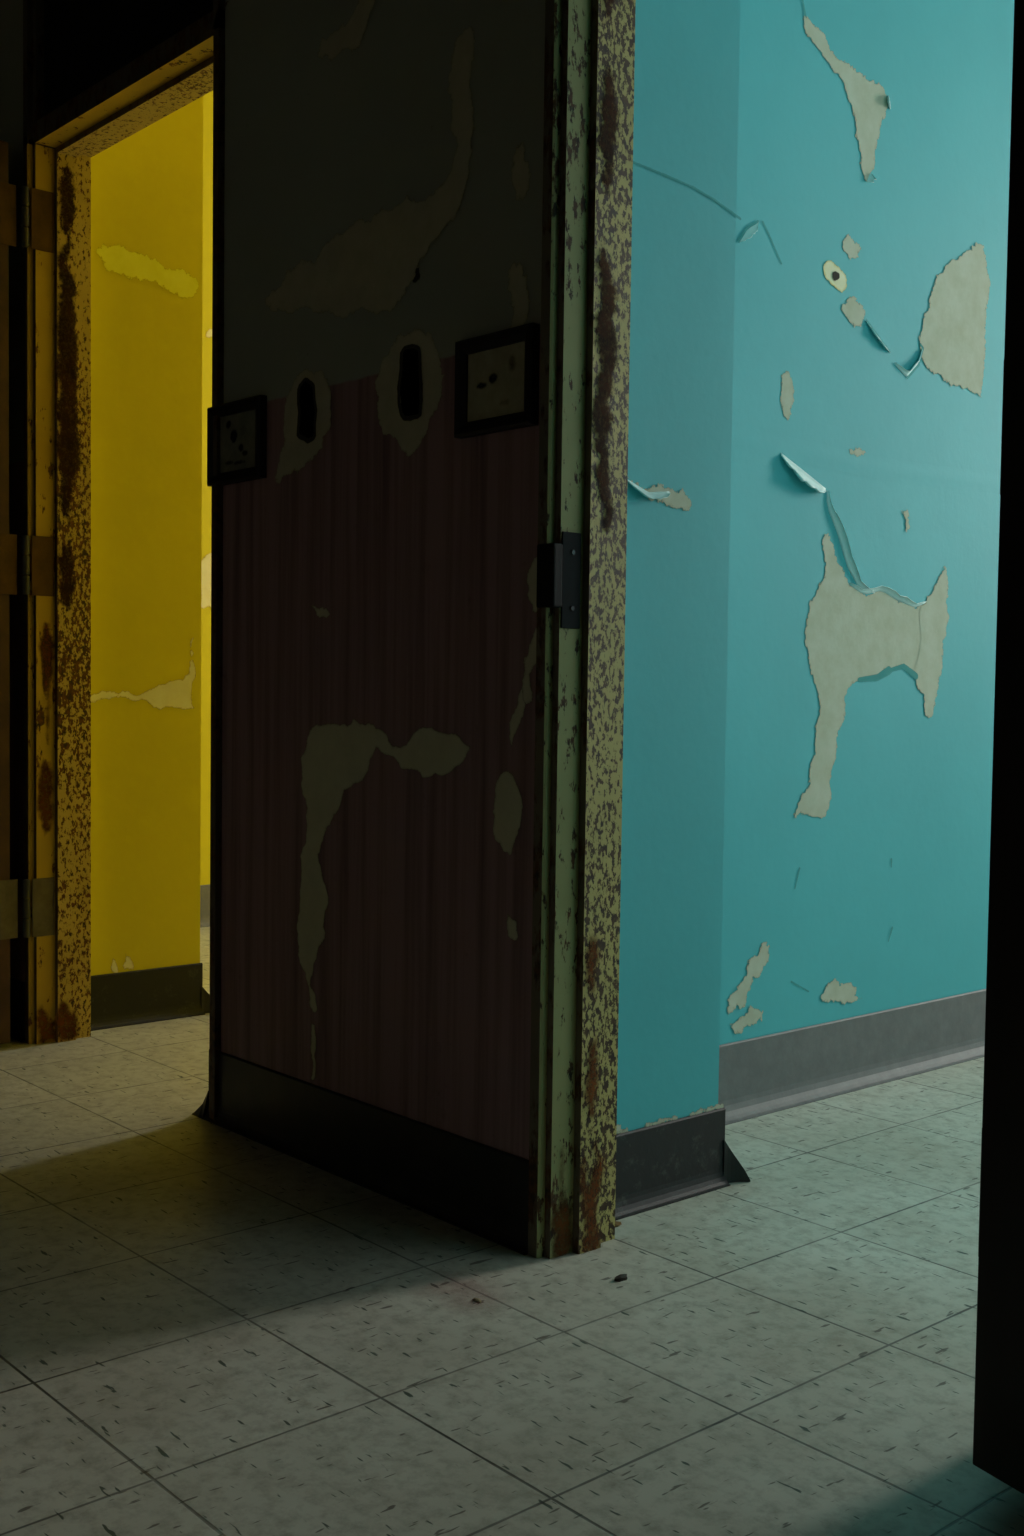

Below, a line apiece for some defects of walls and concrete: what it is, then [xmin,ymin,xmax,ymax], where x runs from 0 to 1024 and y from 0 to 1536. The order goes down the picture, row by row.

rust [598,65,620,194]
peeling [802,0,891,183]
crack [633,161,782,264]
rust [55,163,83,610]
rust [592,237,620,532]
peeling [823,234,990,396]
peeling [628,477,692,511]
peeling [781,453,949,819]
peeling [297,719,471,1080]
rust [35,1001,79,1043]
peeling [727,942,770,1034]
rust [551,1145,604,1257]